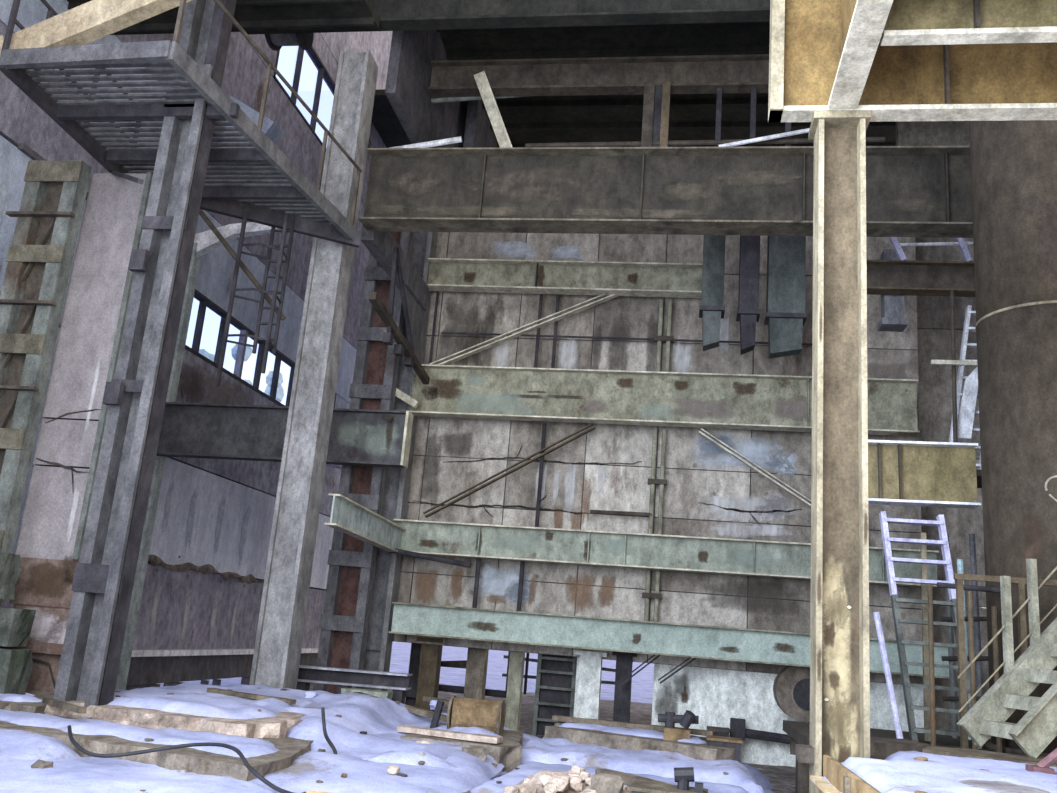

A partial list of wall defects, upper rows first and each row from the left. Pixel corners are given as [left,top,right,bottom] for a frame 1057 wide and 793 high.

crack [46,409,101,423]
crack [36,458,89,488]
corrosion [417,572,436,601]
corrosion [451,572,462,597]
corrosion [566,577,614,607]